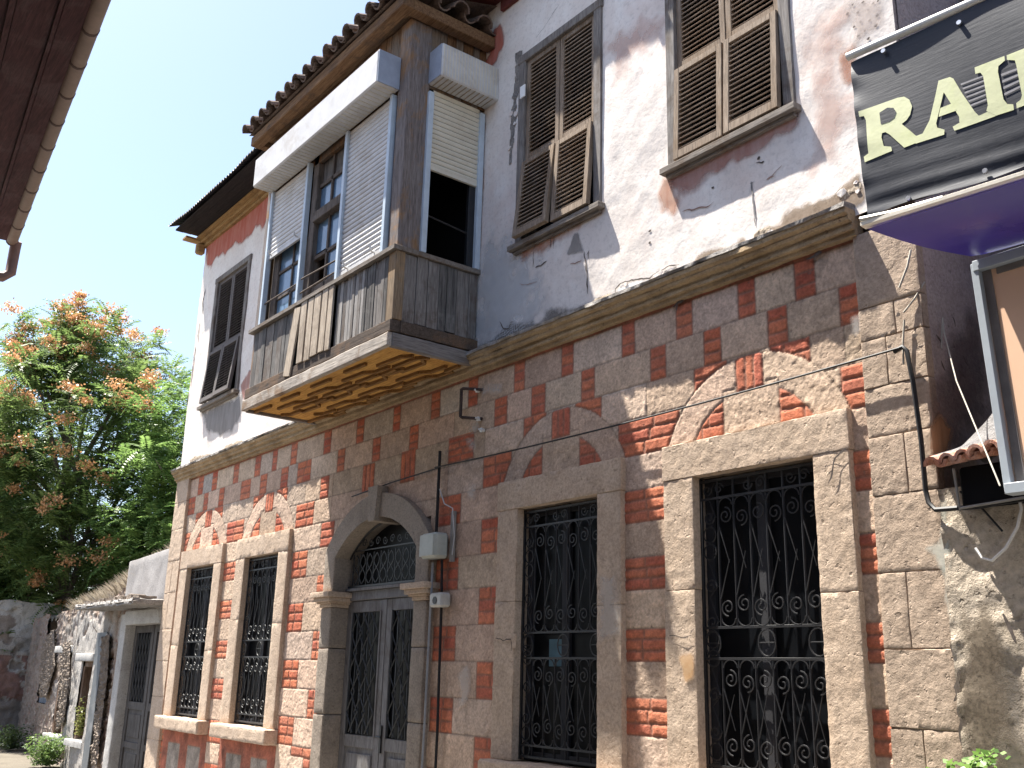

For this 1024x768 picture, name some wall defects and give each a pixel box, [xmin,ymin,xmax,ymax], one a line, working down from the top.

spalling [507,50,522,165]
crack [750,161,782,226]
crack [519,238,589,294]